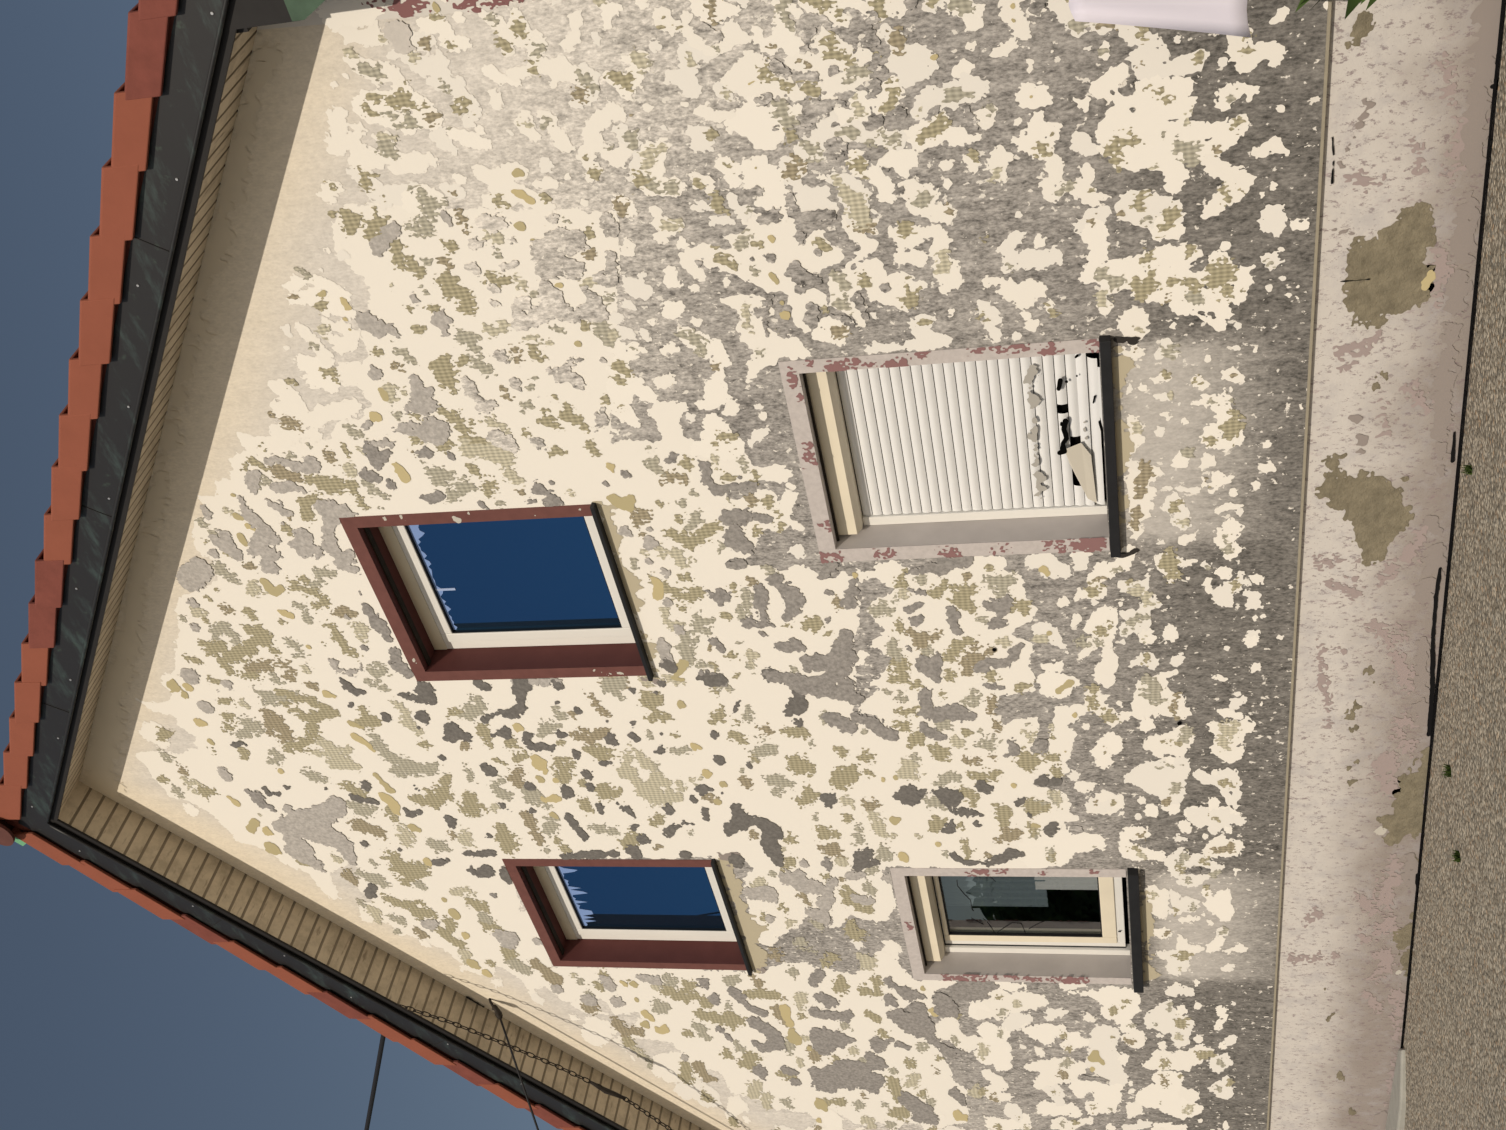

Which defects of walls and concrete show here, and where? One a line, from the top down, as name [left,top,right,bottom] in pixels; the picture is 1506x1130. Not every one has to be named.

spalling [1345,11,1376,50]
spalling [1341,202,1436,330]
peeling [135,0,1310,1130]
spalling [1315,453,1415,567]